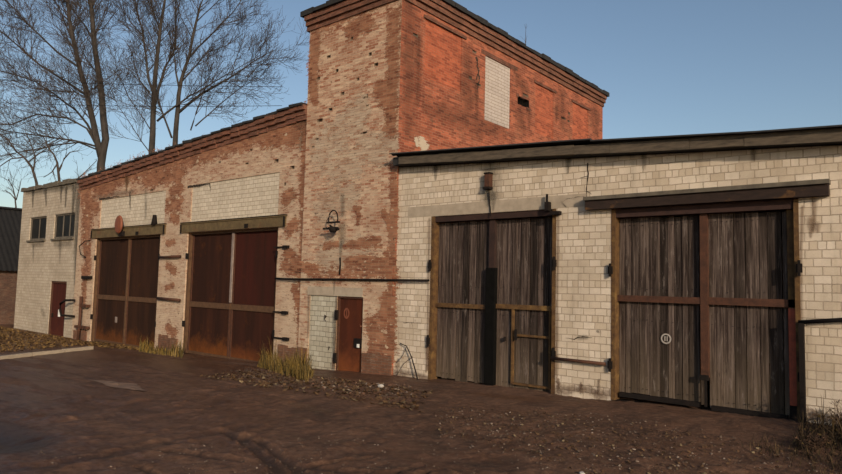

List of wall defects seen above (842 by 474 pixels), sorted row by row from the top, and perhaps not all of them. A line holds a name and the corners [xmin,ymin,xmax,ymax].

peeling [304,1,404,139]
peeling [77,120,403,368]